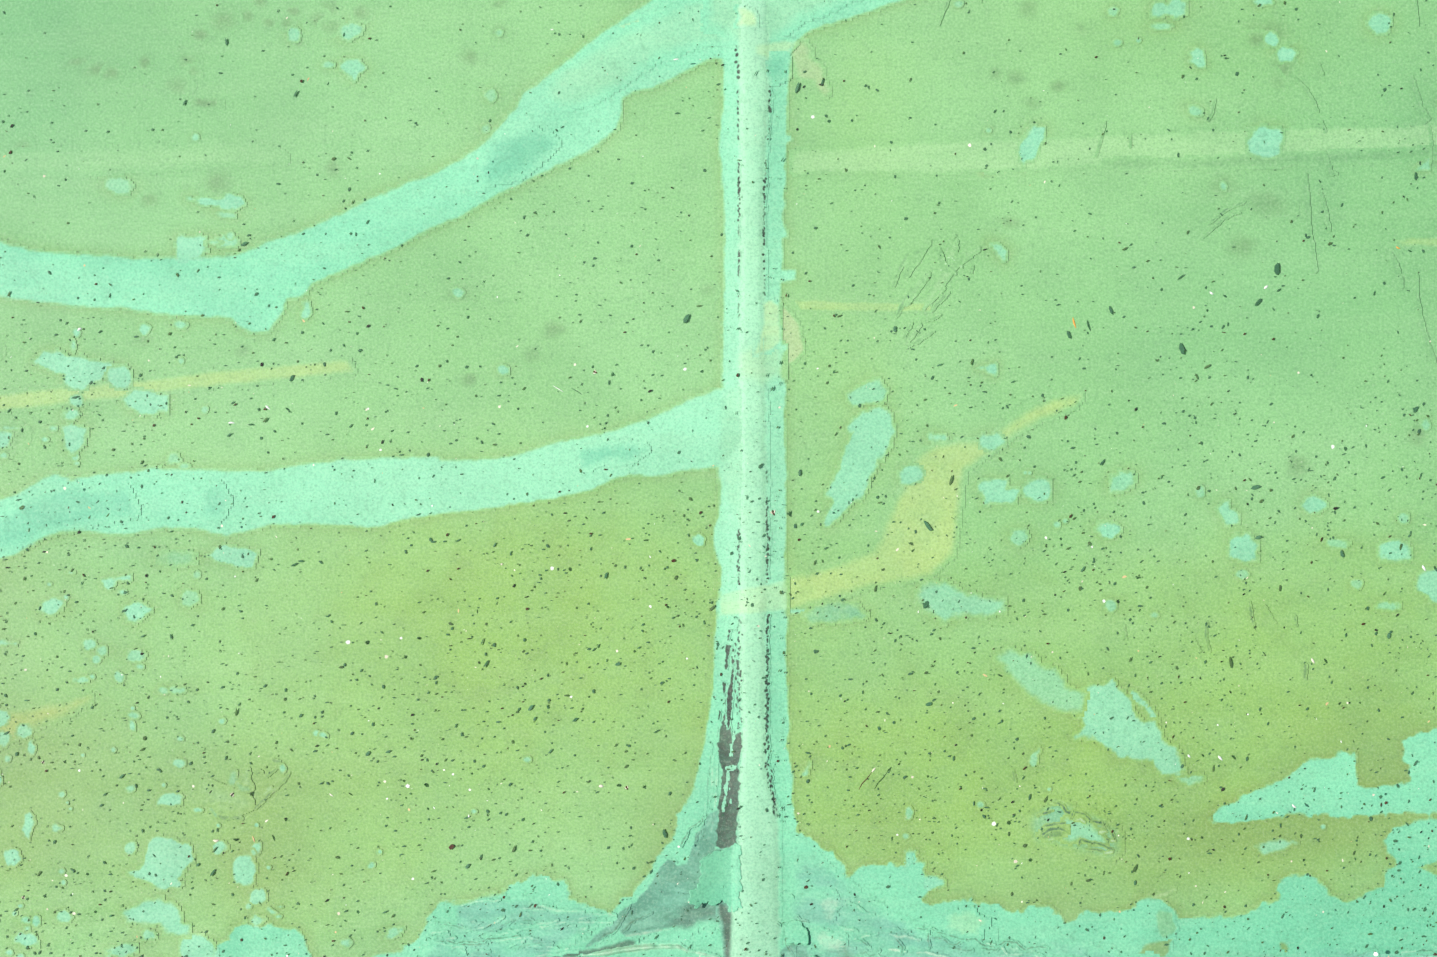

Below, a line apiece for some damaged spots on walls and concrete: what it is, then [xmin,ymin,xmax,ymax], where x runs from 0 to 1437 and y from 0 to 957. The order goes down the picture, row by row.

spalling [1365,11,1393,36]
peeling [767,79,797,302]
peeling [0,0,744,957]
peeling [769,380,790,580]
spalling [820,376,926,528]
spalling [914,578,1008,626]
peeling [1008,527,1031,549]
spalling [1373,512,1437,612]
peeling [769,598,1437,957]